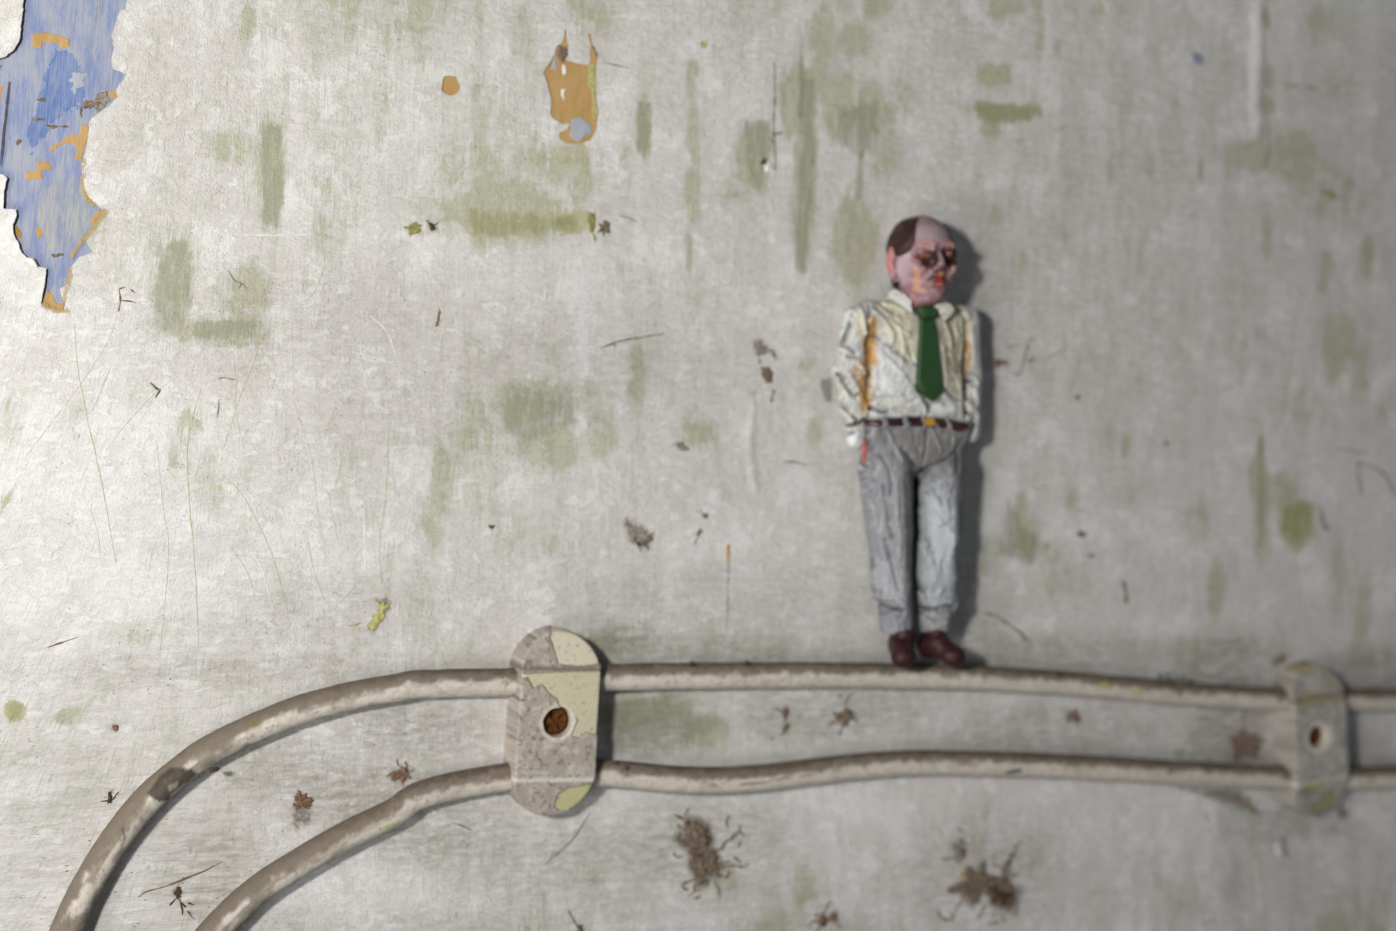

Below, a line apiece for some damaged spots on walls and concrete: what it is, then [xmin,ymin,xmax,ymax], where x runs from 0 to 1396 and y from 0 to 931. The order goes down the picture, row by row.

peeling [0,0,127,314]
peeling [544,30,629,144]